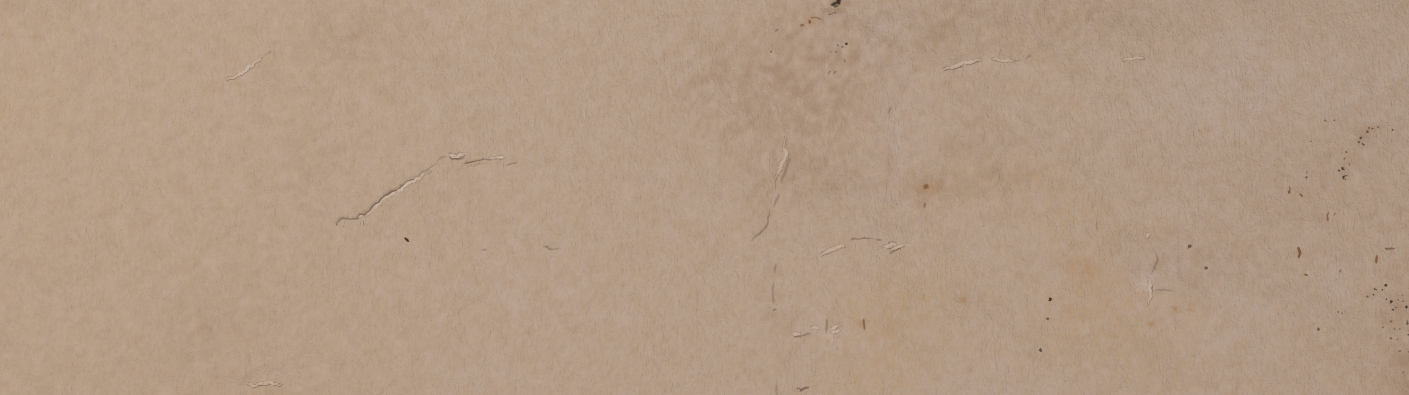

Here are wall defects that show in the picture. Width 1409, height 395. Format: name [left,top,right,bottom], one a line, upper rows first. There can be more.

crack [336,153,505,231]